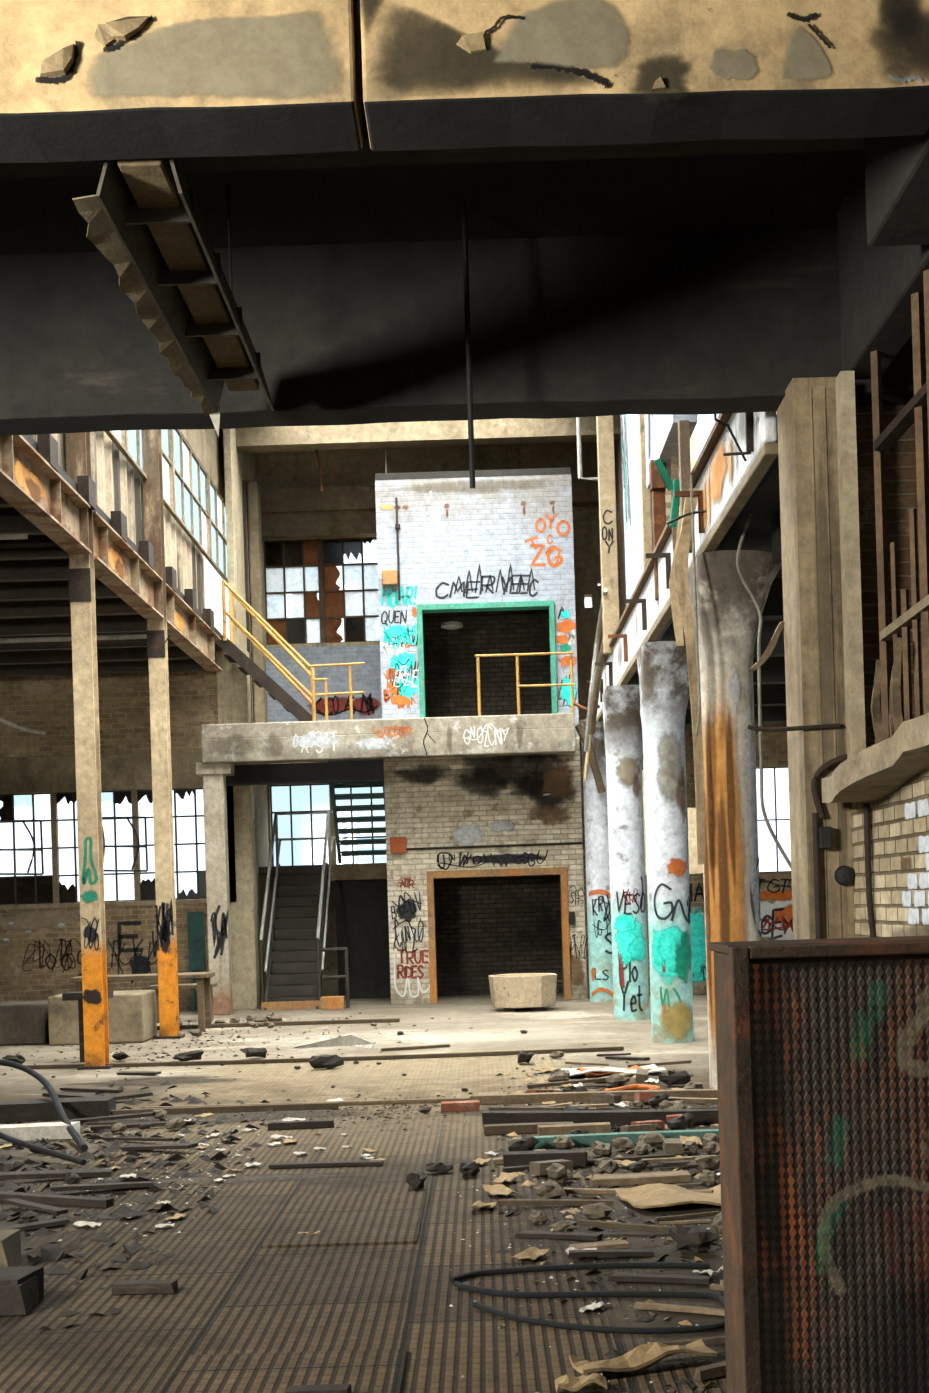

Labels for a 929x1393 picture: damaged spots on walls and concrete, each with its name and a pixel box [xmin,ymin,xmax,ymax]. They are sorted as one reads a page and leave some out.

leakage [360,0,381,26]
leakage [378,11,578,92]
flaking render [456,0,627,89]
flaking render [652,77,666,90]
leakage [635,57,687,99]
flaking render [709,49,757,80]
flaking render [782,12,832,79]
corrosion [703,708,746,1041]